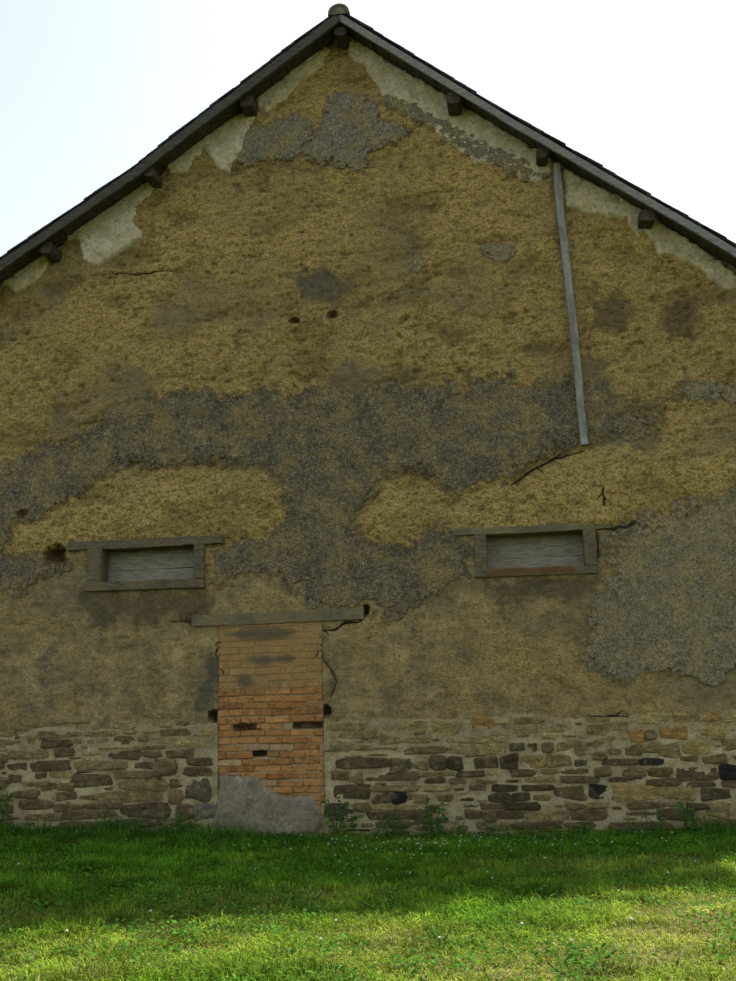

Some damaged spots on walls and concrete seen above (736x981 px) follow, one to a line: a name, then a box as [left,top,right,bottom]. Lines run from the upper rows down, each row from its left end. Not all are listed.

peeling [167,38,736,292]
peeling [67,181,154,267]
peeling [1,255,51,293]
crack [511,451,583,486]
peeling [0,367,736,686]
crack [314,614,367,696]